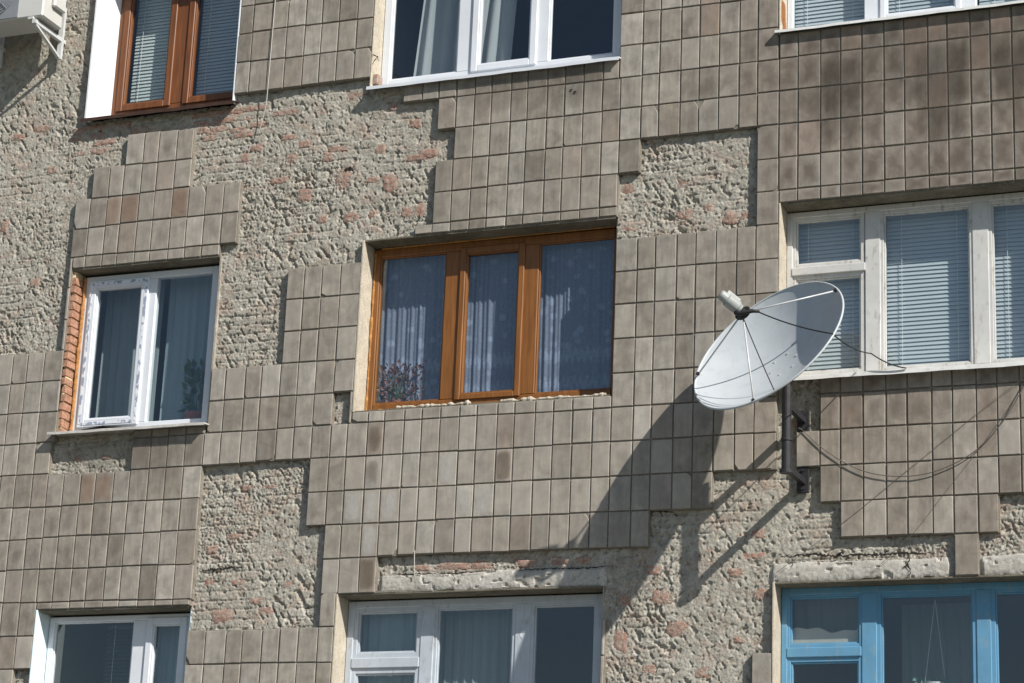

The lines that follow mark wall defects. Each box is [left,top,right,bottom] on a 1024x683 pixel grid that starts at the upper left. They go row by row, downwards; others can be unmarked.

spalling [0,0,455,369]
spalling [617,129,757,239]
spalling [52,432,134,474]
spalling [190,460,325,631]
spalling [378,380,955,683]
crack [780,550,939,576]
spalling [980,494,1024,576]